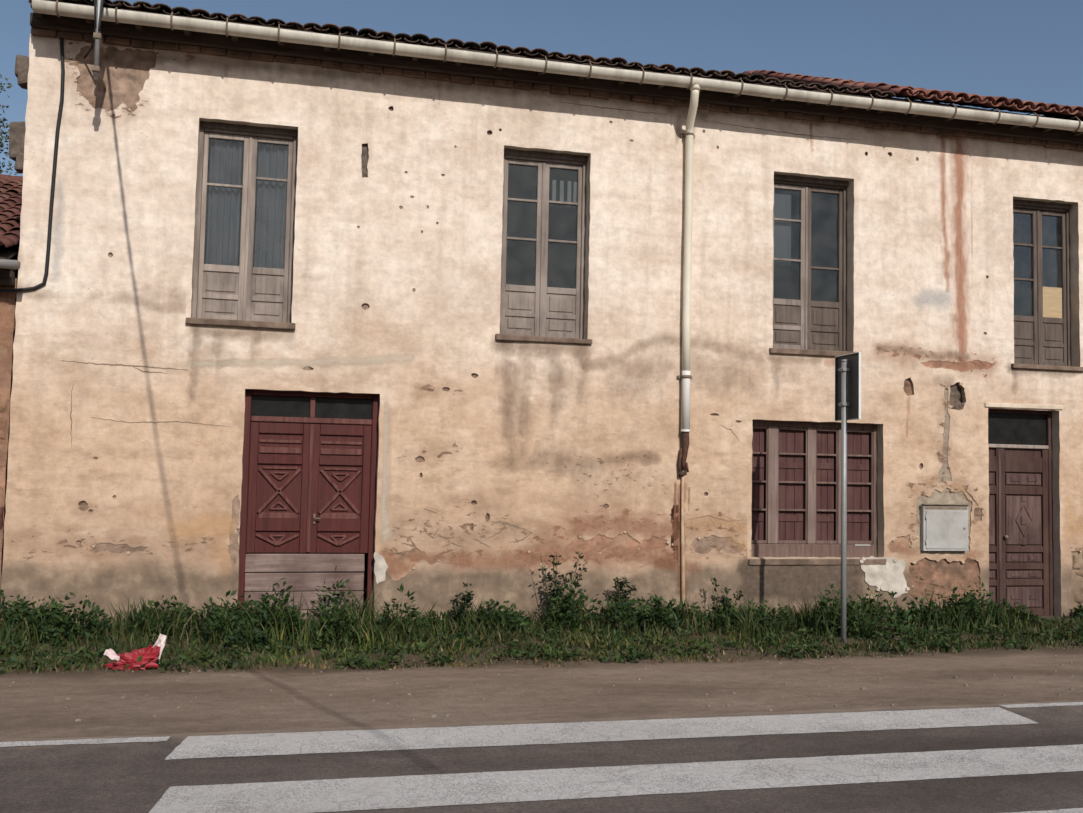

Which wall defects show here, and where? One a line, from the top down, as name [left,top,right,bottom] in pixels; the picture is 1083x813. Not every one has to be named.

flaking render [64,42,195,119]
rust [941,136,964,351]
flaking render [399,442,459,478]
flaking render [382,454,747,581]
flaking render [859,345,998,604]